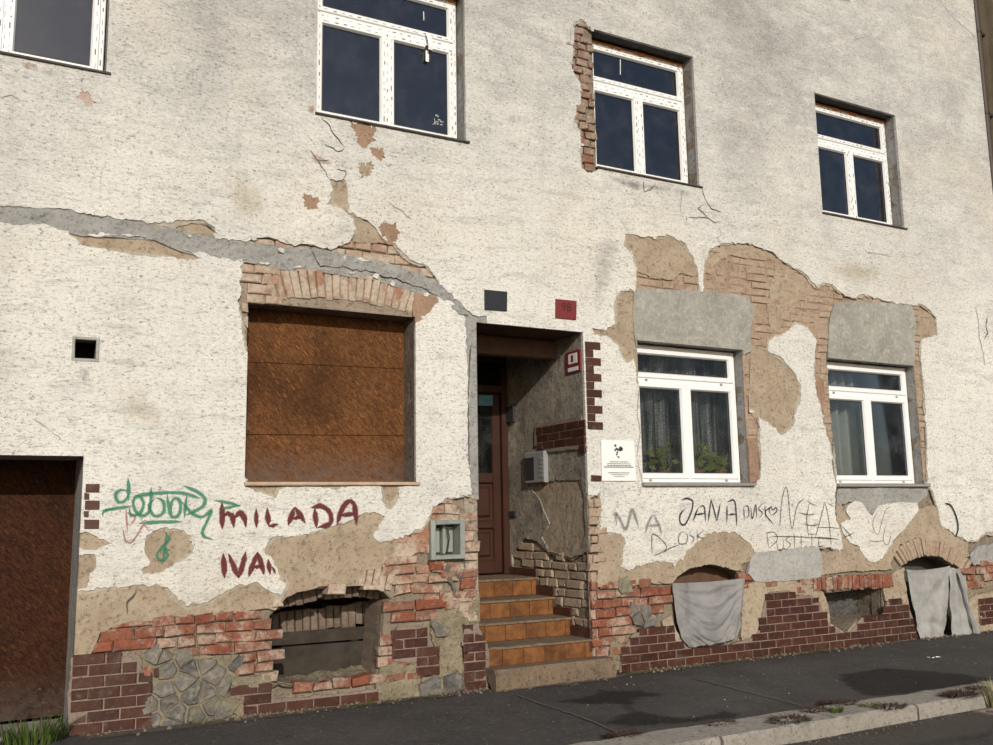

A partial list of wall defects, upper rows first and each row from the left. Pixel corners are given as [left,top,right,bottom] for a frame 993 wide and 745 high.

flaking render [566,19,599,173]
flaking render [350,122,384,177]
flaking render [69,220,216,263]
flaking render [237,179,439,351]
crack [681,190,722,223]
flaking render [592,234,939,487]
flaking render [77,530,112,595]
flaking render [141,527,194,585]
flaking render [358,493,480,622]
flaking render [512,499,673,656]
flaking render [765,532,993,593]
flaking render [93,602,285,682]